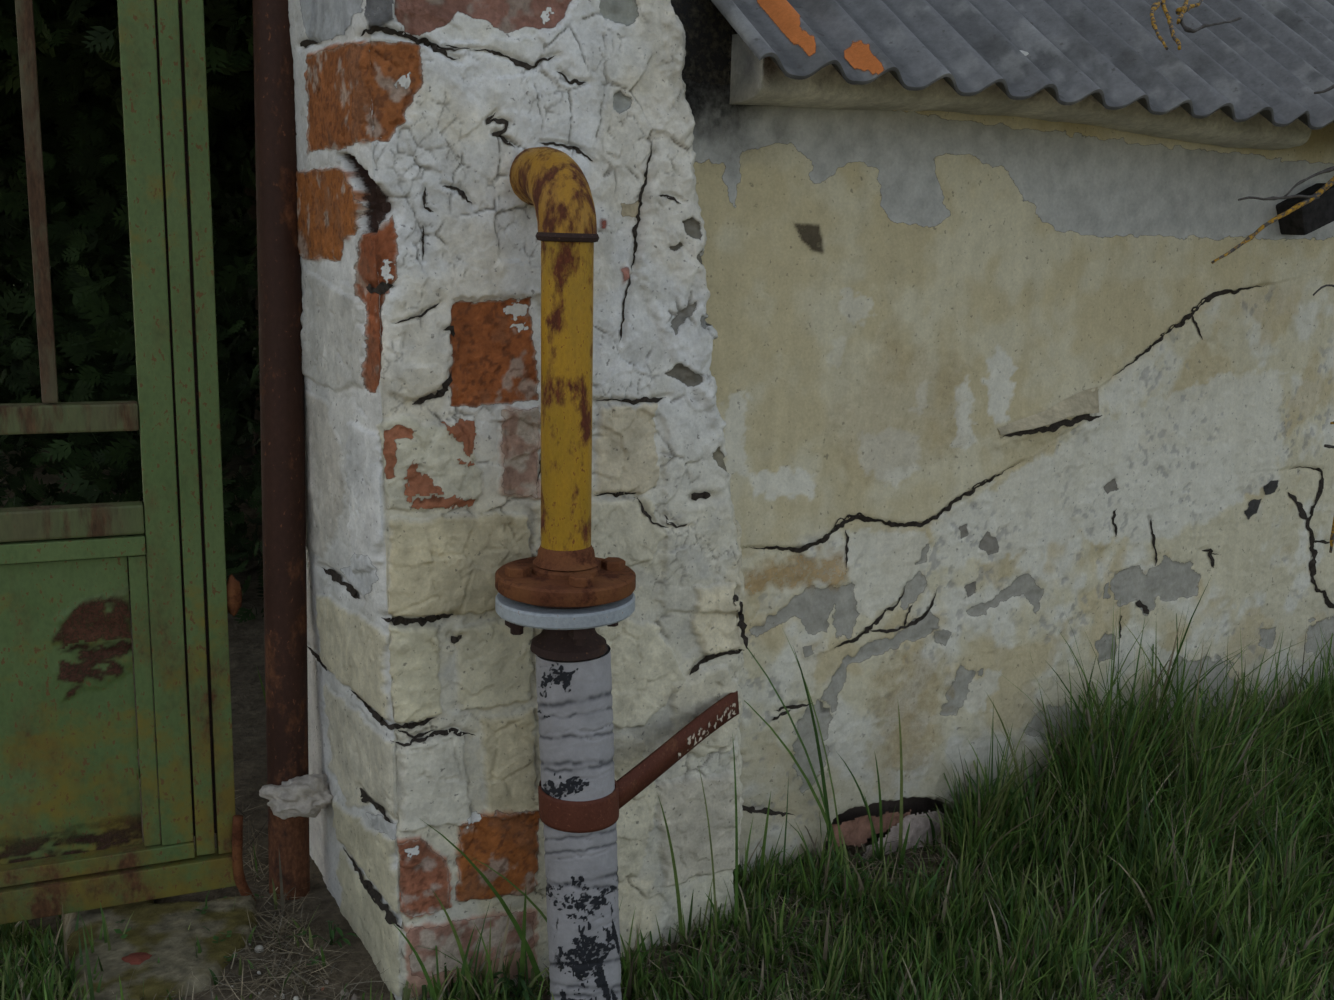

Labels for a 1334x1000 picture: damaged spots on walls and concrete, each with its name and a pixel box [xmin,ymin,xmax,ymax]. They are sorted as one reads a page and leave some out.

peeling [599,0,639,26]
spalling [296,0,572,393]
rust [53,597,132,697]
spalling [383,425,475,509]
spalling [441,297,541,499]
peeling [750,544,951,795]
crack [754,414,1102,569]
peeling [964,573,1044,617]
crack [1288,466,1334,608]
rust [0,817,143,864]
spalling [397,810,540,979]
spalling [827,810,952,863]